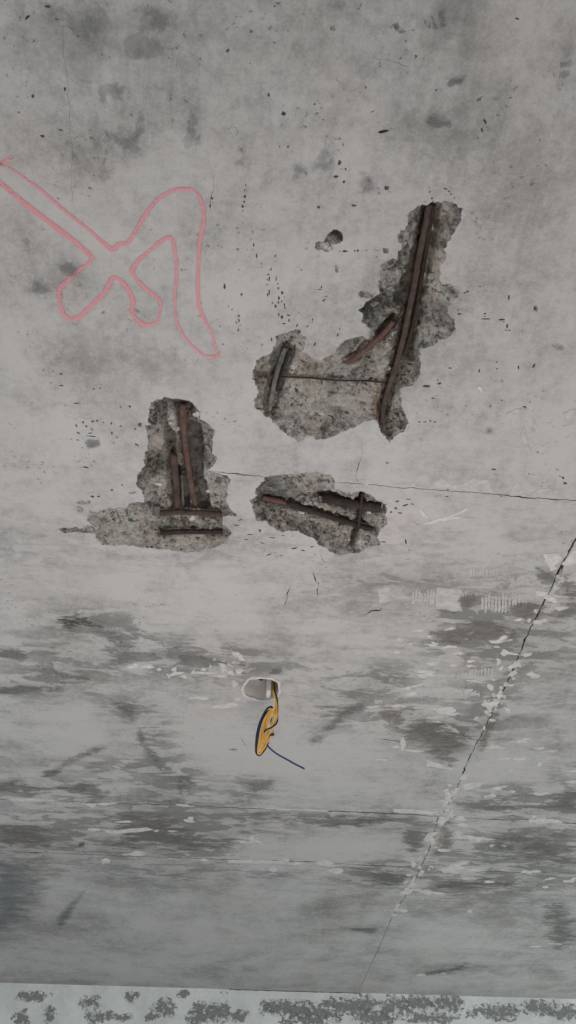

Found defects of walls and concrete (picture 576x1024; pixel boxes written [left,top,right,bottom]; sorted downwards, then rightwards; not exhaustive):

spalling [252,188,481,442]
spalling [58,397,413,556]
crack [333,453,576,518]
leakage [56,614,101,633]
leakage [432,622,515,644]
leakage [510,603,537,618]
leakage [379,710,466,767]
crack [229,538,576,994]
leakage [103,811,224,850]
flaking render [10,990,55,1024]
flaking render [78,992,139,1024]
flaking render [145,989,576,1024]